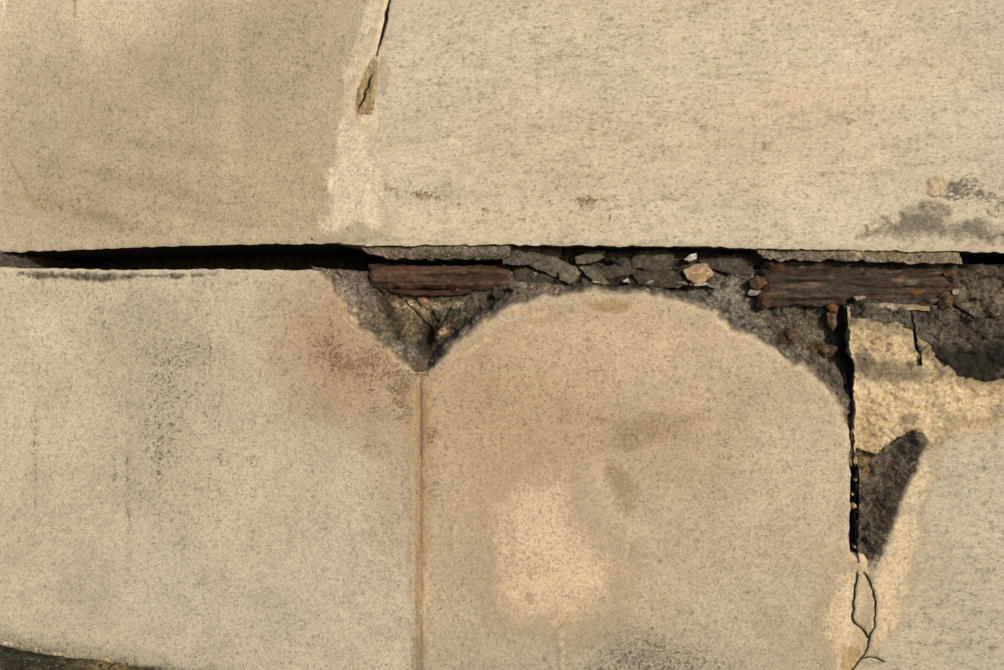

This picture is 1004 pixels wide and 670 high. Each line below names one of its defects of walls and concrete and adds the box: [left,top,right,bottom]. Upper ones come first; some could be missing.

crack [359,0,391,107]
spalling [314,248,1004,569]
crack [838,308,884,669]